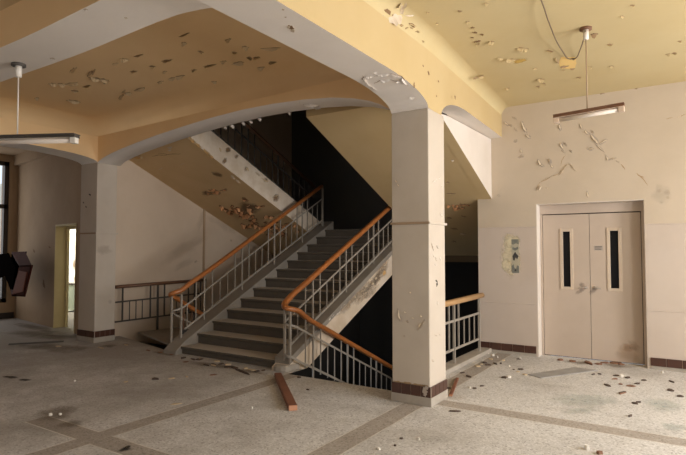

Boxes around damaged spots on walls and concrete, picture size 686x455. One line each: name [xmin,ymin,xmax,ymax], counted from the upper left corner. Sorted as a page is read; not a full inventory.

peeling [149,46,279,85]
crack [536,156,576,191]
peeling [219,197,300,239]